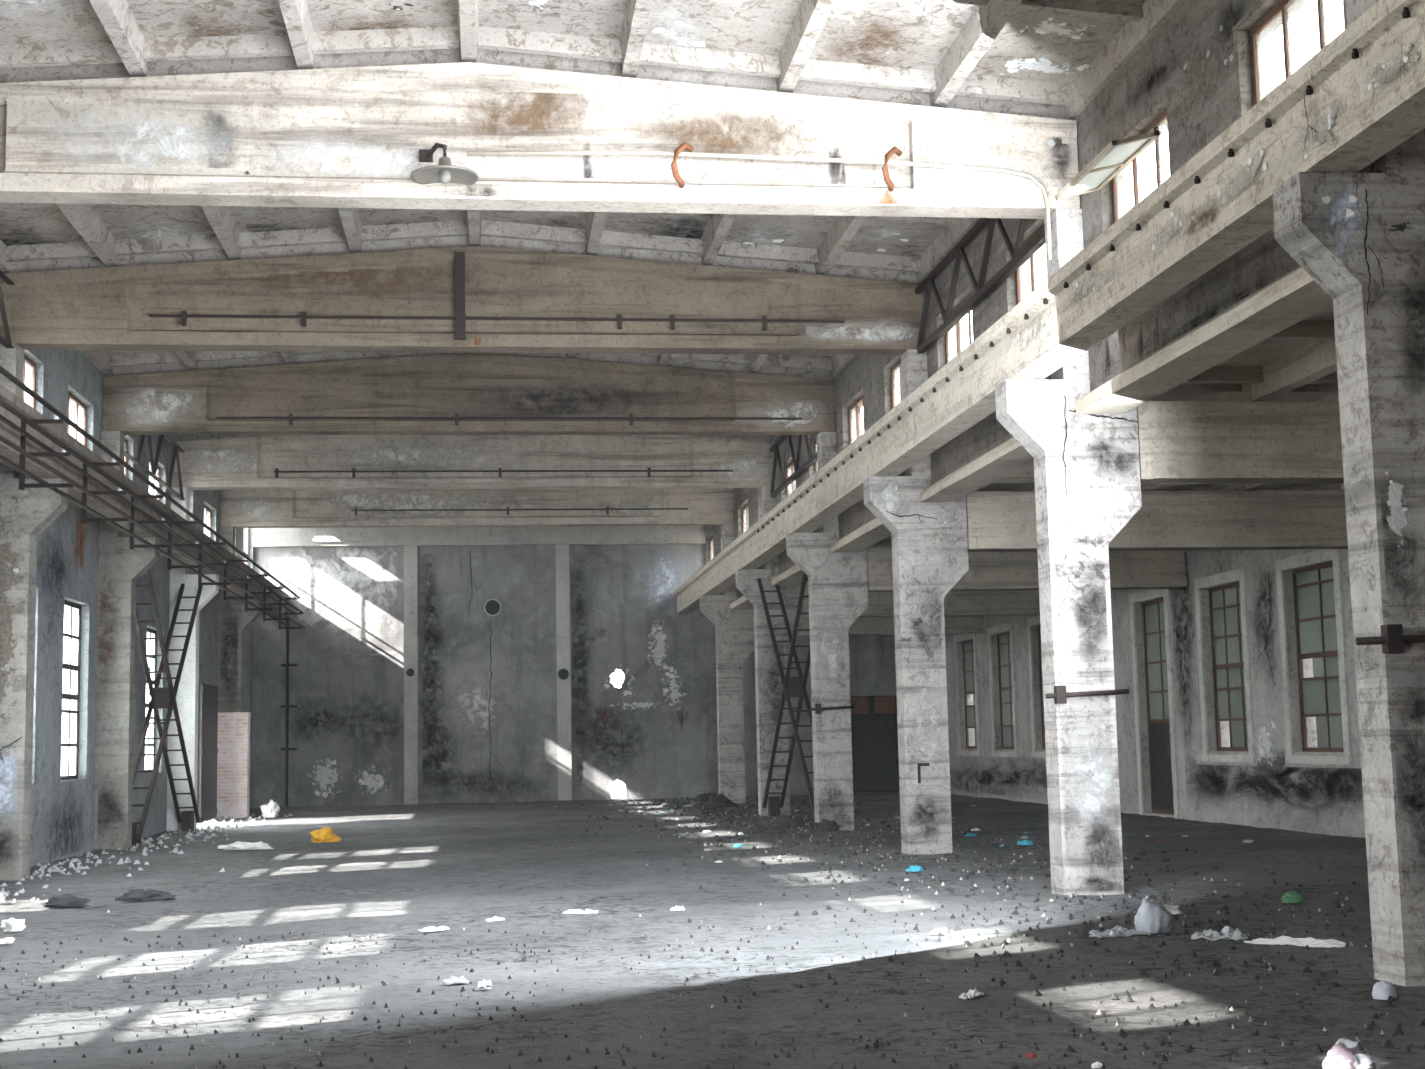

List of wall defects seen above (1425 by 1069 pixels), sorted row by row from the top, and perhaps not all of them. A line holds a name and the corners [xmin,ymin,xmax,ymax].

leakage [483,93,563,133]
peeling [1322,194,1359,251]
leakage [1404,288,1425,390]
peeling [1385,471,1408,551]
leakage [422,564,528,792]
leakage [1193,756,1362,802]